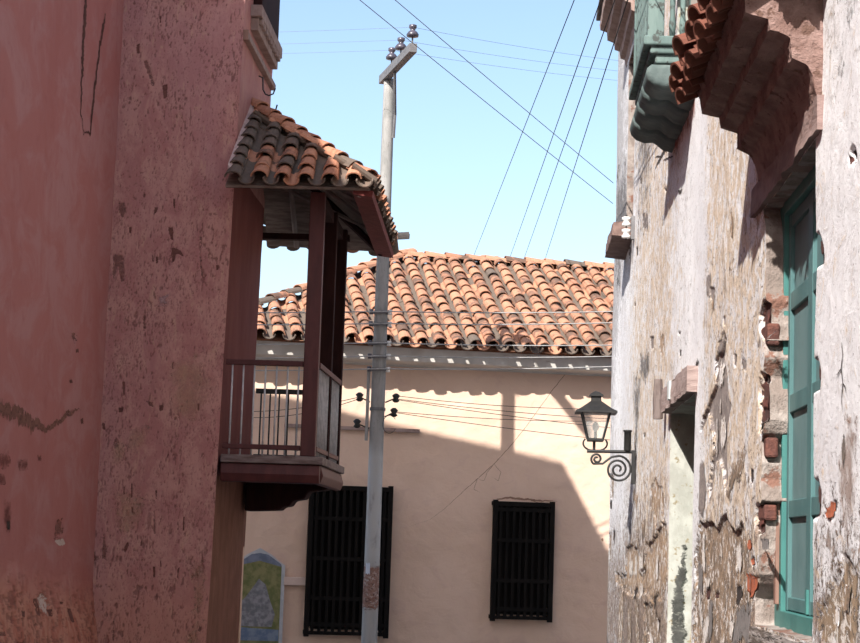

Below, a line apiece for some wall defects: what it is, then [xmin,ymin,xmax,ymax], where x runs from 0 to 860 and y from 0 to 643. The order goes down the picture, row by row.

crack [80,0,106,136]
peeling [706,275,715,310]
flaking render [763,302,775,339]
crack [0,402,81,433]
flaking render [760,374,771,434]
crack [836,350,846,413]
peeling [691,317,769,643]
flaking render [816,479,837,519]
peeling [608,477,668,643]
flaking render [33,594,74,623]
peeling [816,543,860,643]